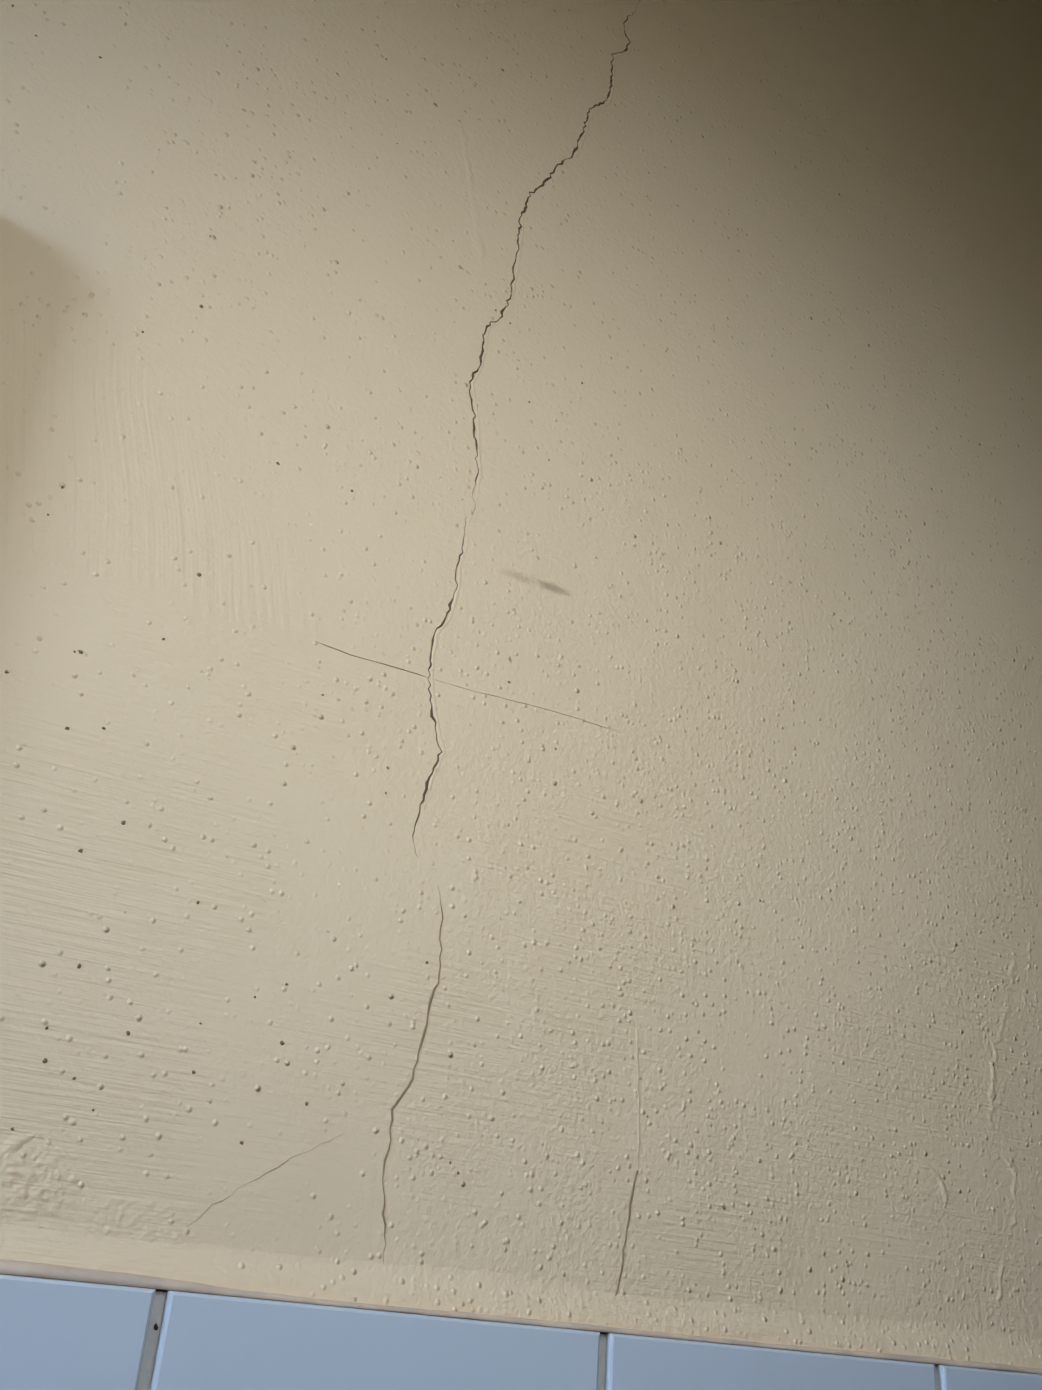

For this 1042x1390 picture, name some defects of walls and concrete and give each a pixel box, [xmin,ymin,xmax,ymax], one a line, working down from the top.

crack [315,0,641,855]
crack [382,887,443,1263]
crack [615,1031,640,1296]